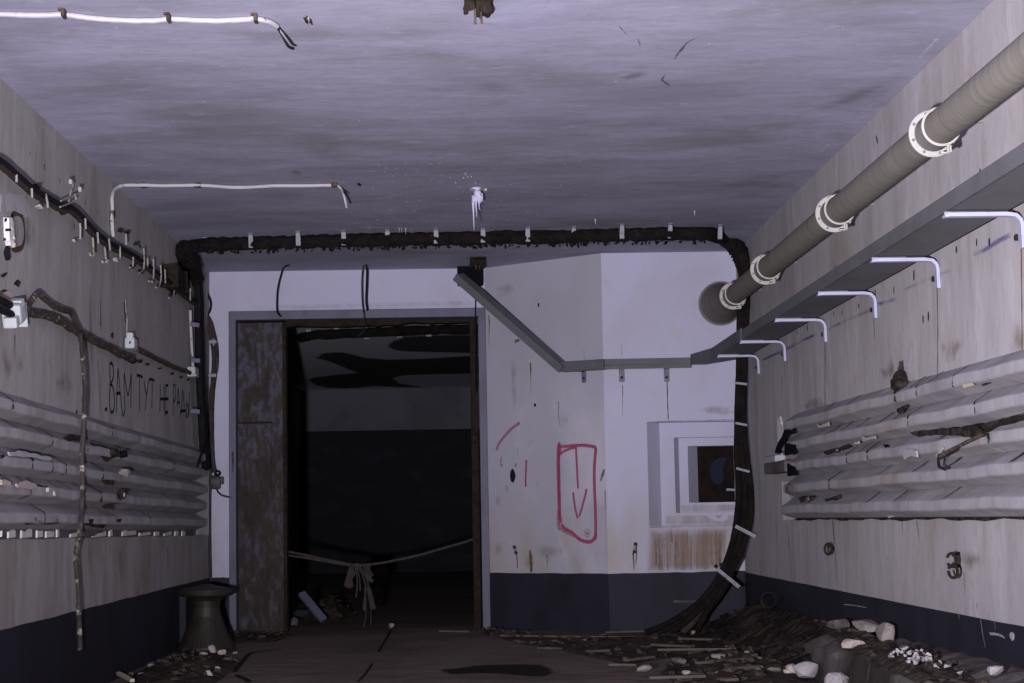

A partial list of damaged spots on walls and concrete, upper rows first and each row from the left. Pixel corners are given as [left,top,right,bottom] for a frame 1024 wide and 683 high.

corrosion [652,533,723,567]